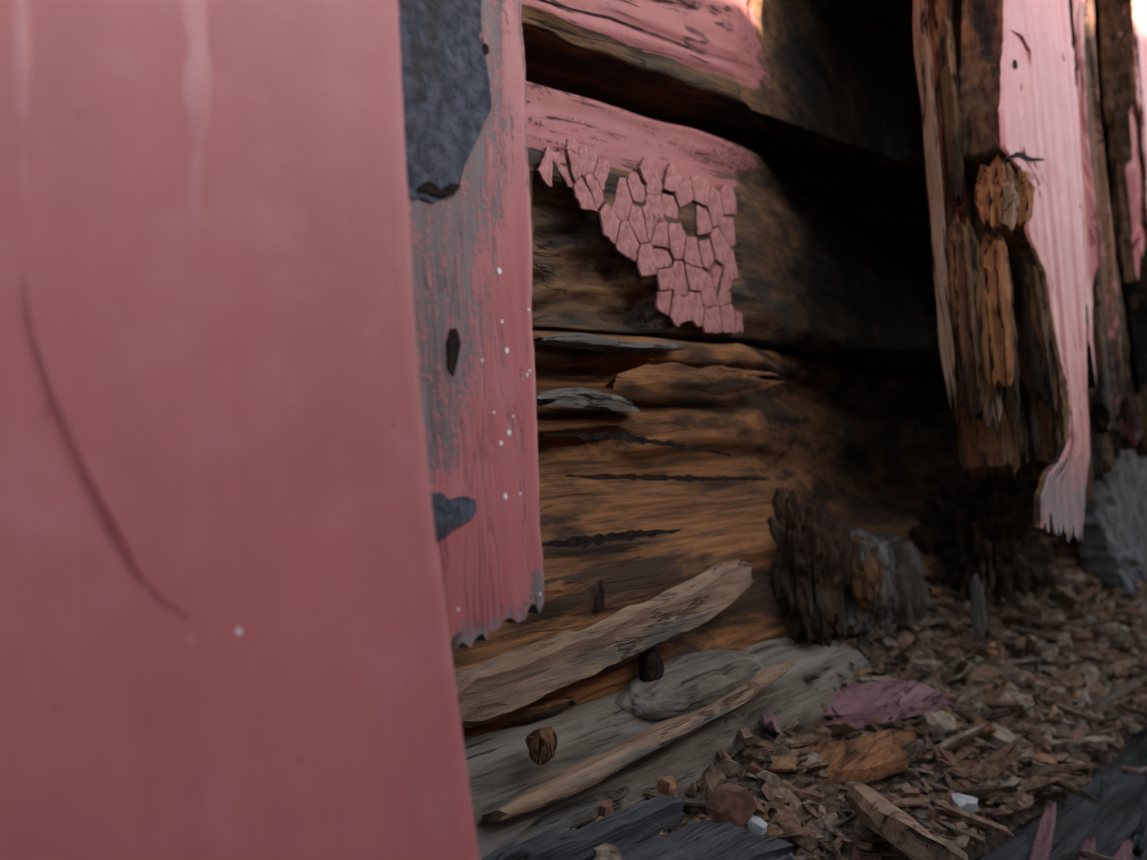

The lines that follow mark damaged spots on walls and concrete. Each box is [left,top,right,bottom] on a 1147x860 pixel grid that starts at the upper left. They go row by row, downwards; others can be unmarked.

peeling [398,0,492,203]
peeling [536,138,743,334]
crack [23,277,192,619]
peeling [431,492,477,542]